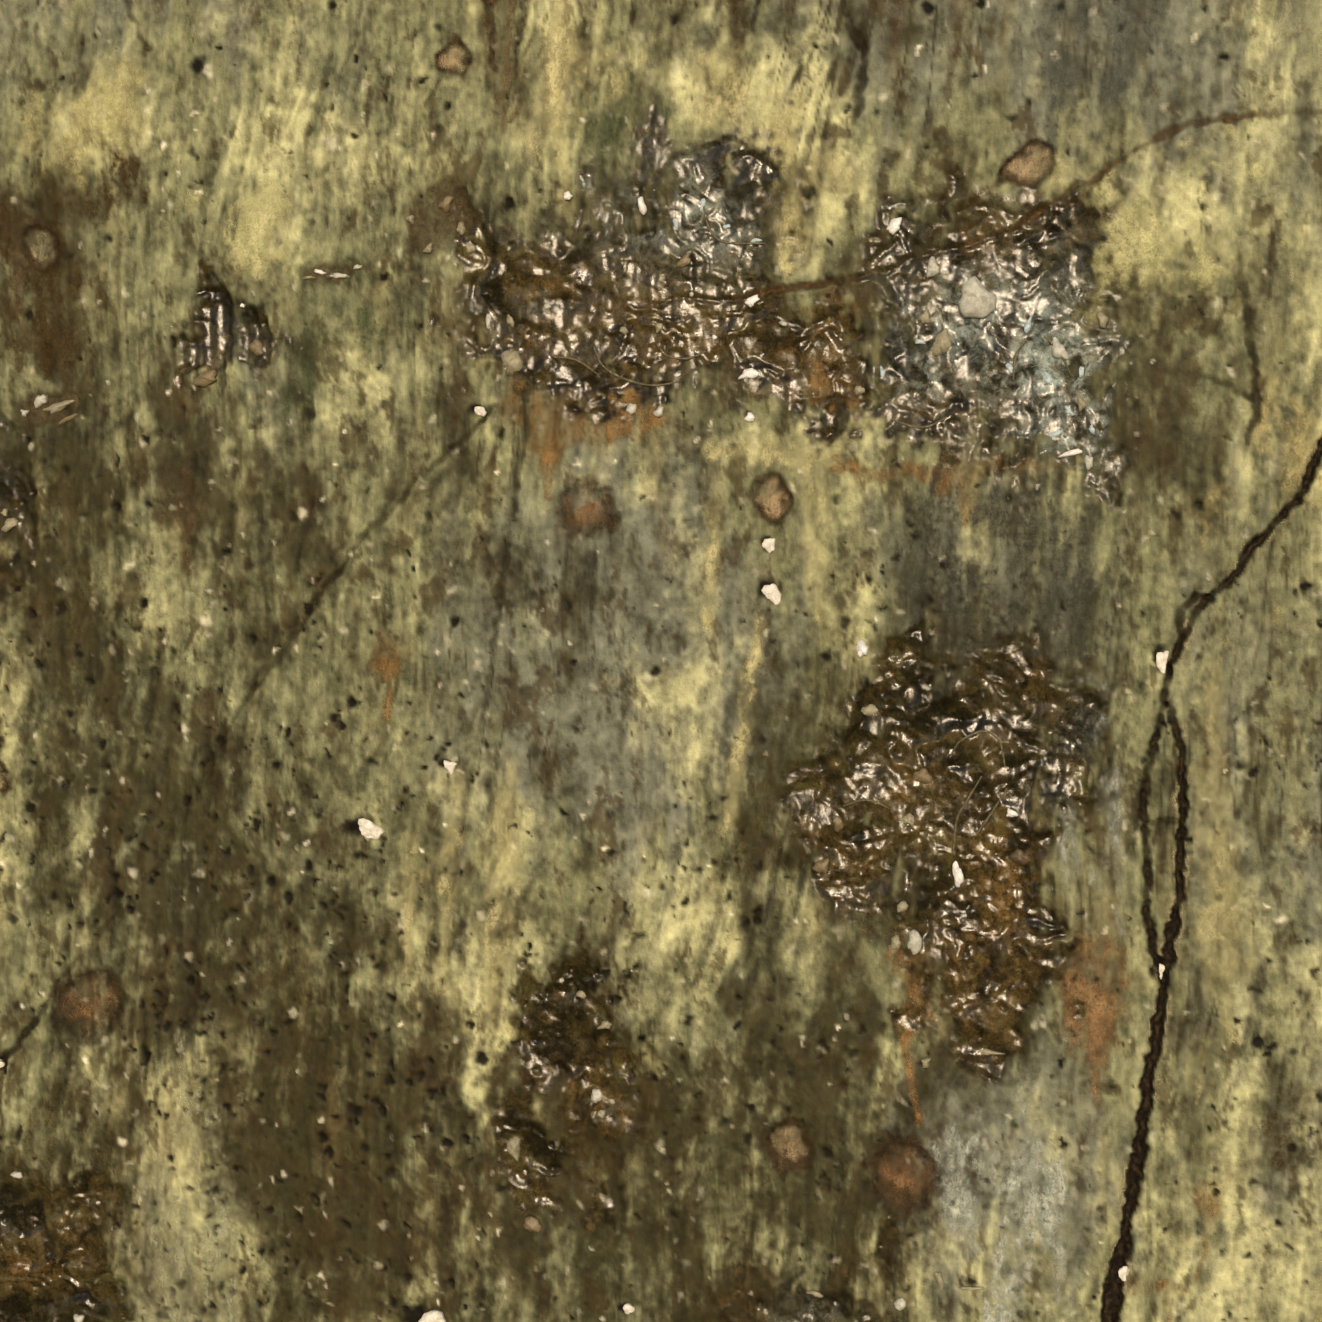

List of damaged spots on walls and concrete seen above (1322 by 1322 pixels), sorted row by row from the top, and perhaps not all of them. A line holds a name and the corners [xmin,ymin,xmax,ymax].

crack [1013,111,1272,231]
spalling [171,250,293,388]
spalling [403,106,1135,501]
crack [749,279,842,297]
crack [1239,258,1260,437]
crack [300,567,344,631]
spalling [782,619,1107,1085]
crack [1101,438,1322,1322]
crack [0,967,70,1070]